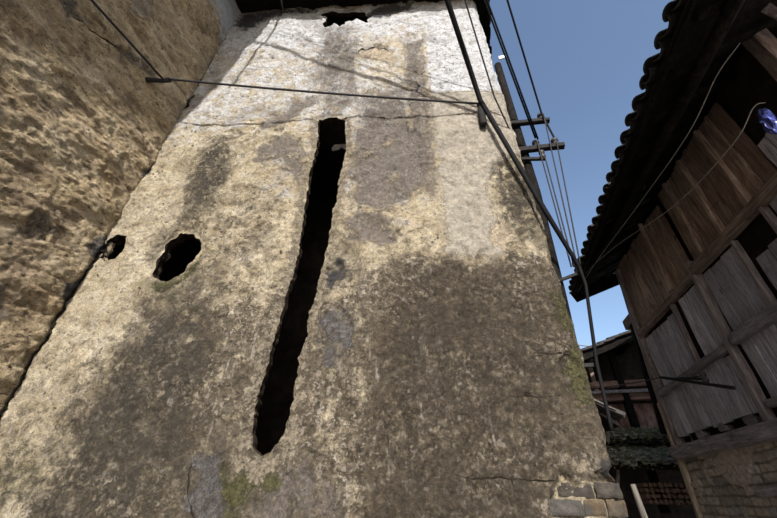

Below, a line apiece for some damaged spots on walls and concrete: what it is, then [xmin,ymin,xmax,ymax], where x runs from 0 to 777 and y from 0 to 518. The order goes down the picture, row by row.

damp [320,25,436,195]
spalling [87,236,111,257]
damp [28,295,222,518]
crack [231,116,355,491]
damp [363,254,575,518]